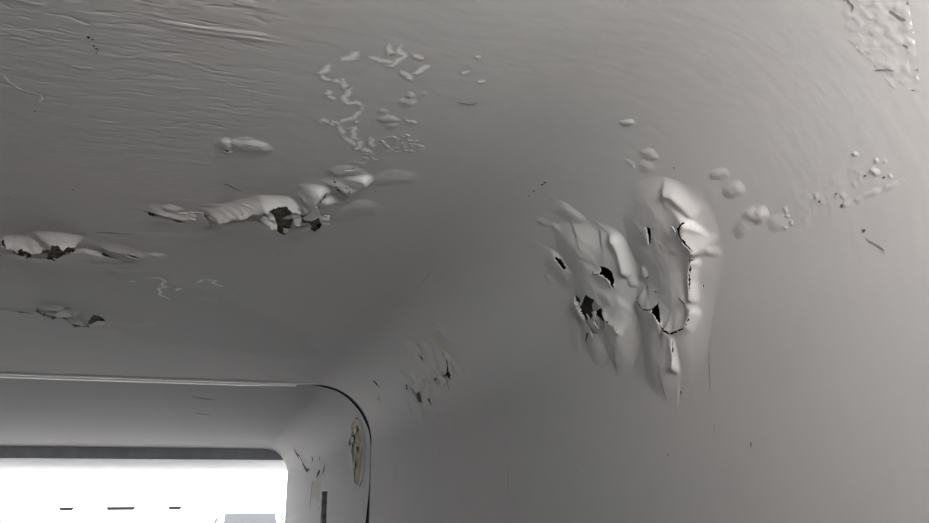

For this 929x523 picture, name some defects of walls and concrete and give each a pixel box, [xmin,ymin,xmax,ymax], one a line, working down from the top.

peeling [0,116,426,278]
peeling [0,304,158,334]
peeling [526,177,725,417]
spalling [347,418,367,489]